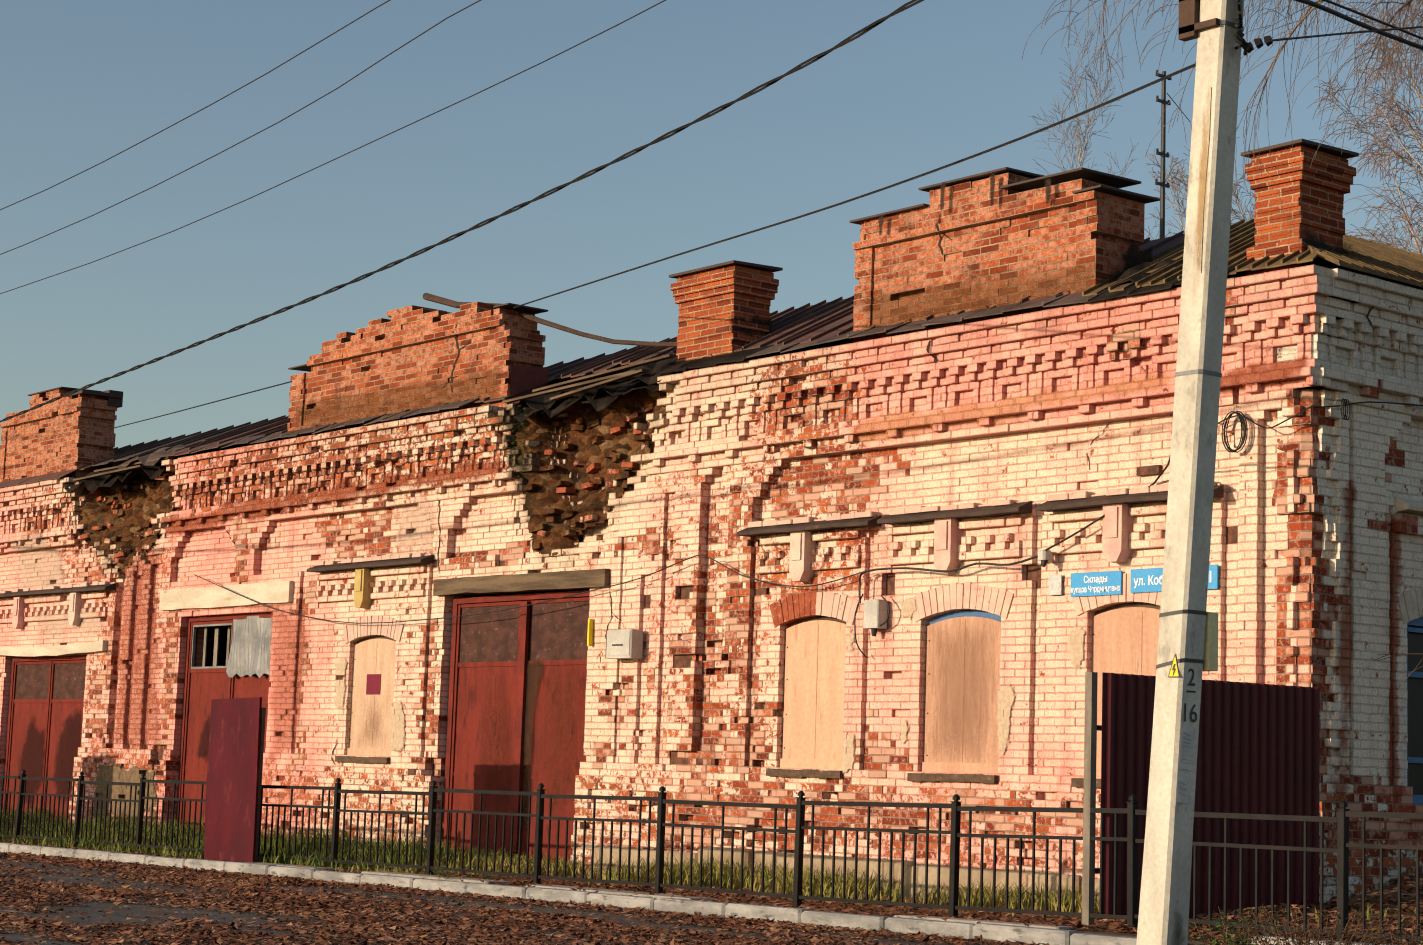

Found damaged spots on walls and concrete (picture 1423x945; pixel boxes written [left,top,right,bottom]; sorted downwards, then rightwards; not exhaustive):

spalling [1286,388,1334,426]
spalling [1277,449,1330,515]
peeling [60,562,107,594]
peeling [614,527,660,557]
peeling [657,364,1083,852]
peeling [73,609,205,777]
peeling [592,668,655,769]
spalling [1276,556,1423,858]